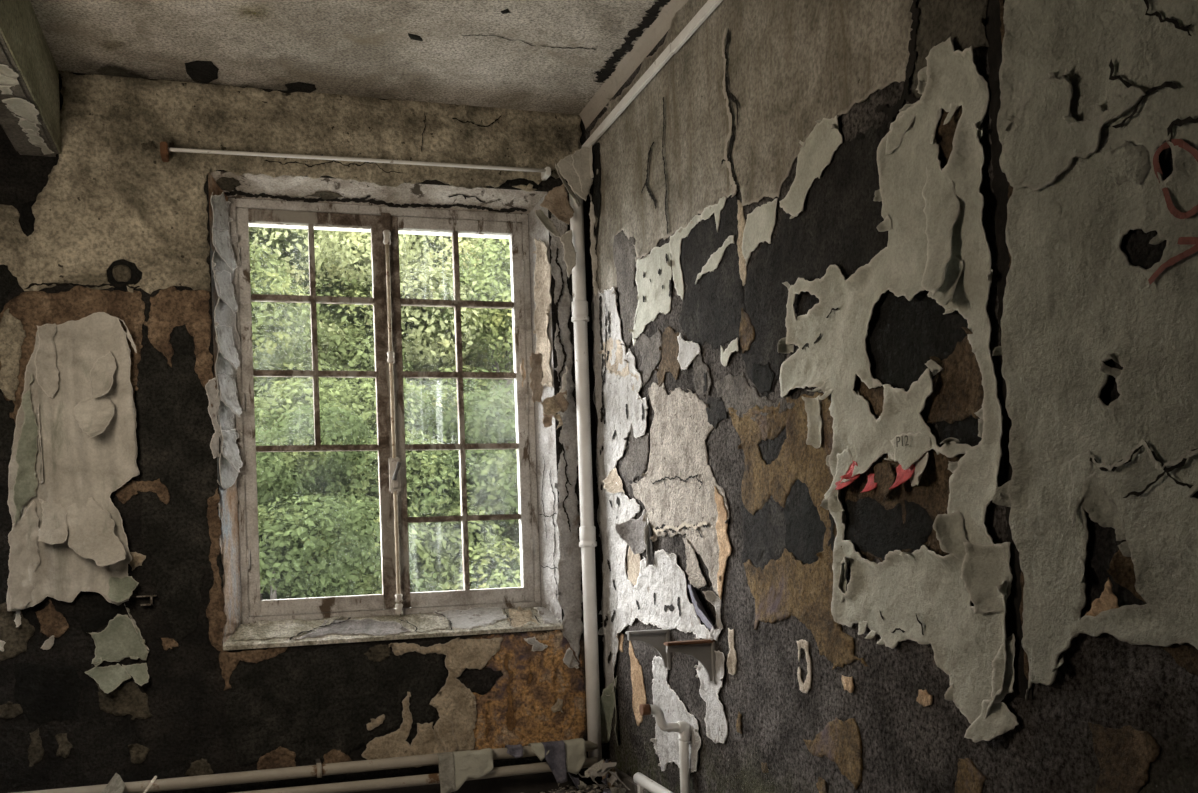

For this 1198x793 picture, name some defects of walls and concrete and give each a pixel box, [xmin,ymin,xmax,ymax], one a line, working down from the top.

flaking render [0,61,584,767]
peeling [650,650,728,773]
peeling [587,0,1198,724]
crack [1087,439,1198,498]